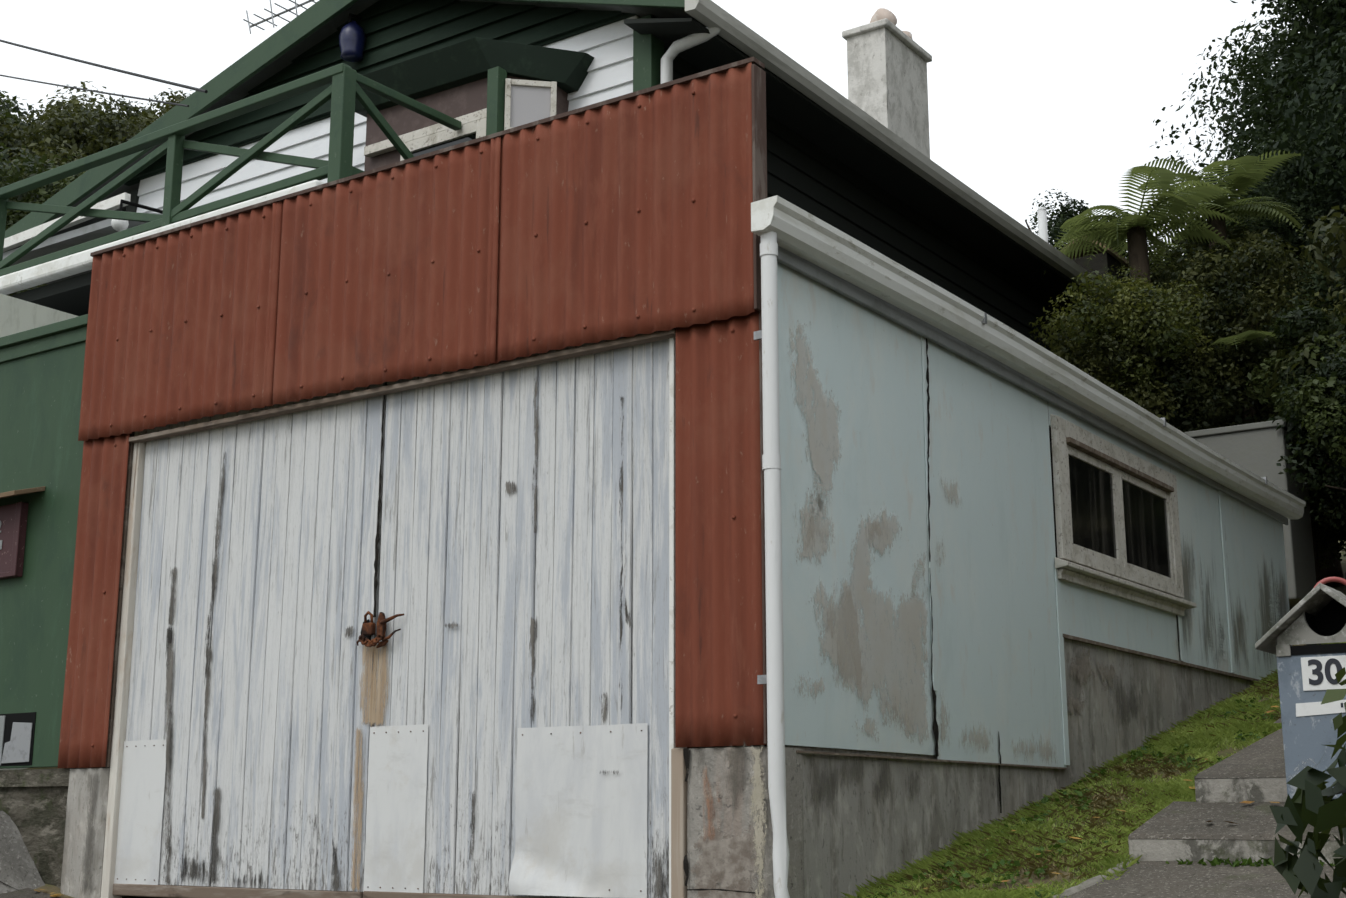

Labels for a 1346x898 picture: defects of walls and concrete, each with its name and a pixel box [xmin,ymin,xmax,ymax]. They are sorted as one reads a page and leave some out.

water stain [174,852,208,886]
water stain [229,872,266,889]
water stain [309,816,344,891]